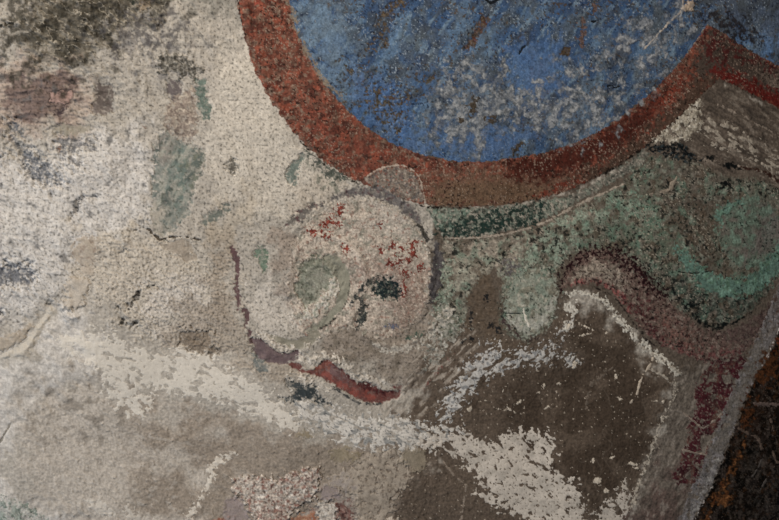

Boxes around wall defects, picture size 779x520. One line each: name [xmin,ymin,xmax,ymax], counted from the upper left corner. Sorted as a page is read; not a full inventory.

damp [31,0,126,66]
peeling [554,314,574,344]
peeling [562,289,682,412]